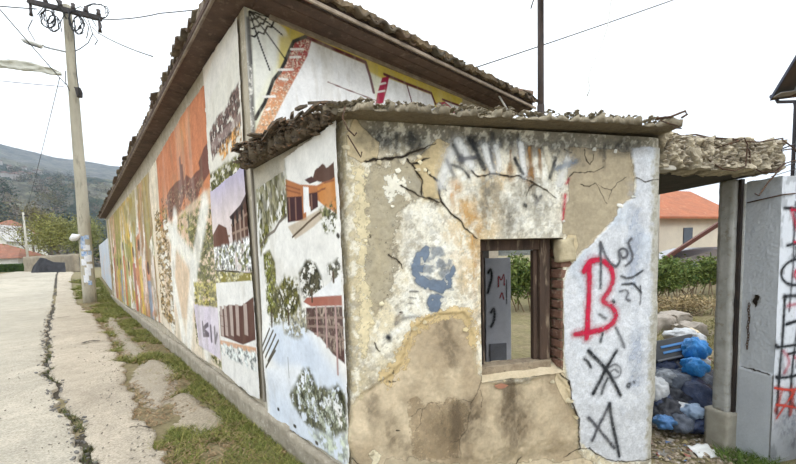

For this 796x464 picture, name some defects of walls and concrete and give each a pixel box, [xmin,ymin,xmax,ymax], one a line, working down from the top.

flaking render [342,119,451,359]
crack [364,143,478,239]
crack [471,149,659,204]
spalling [656,110,796,196]
flaking render [348,305,596,464]